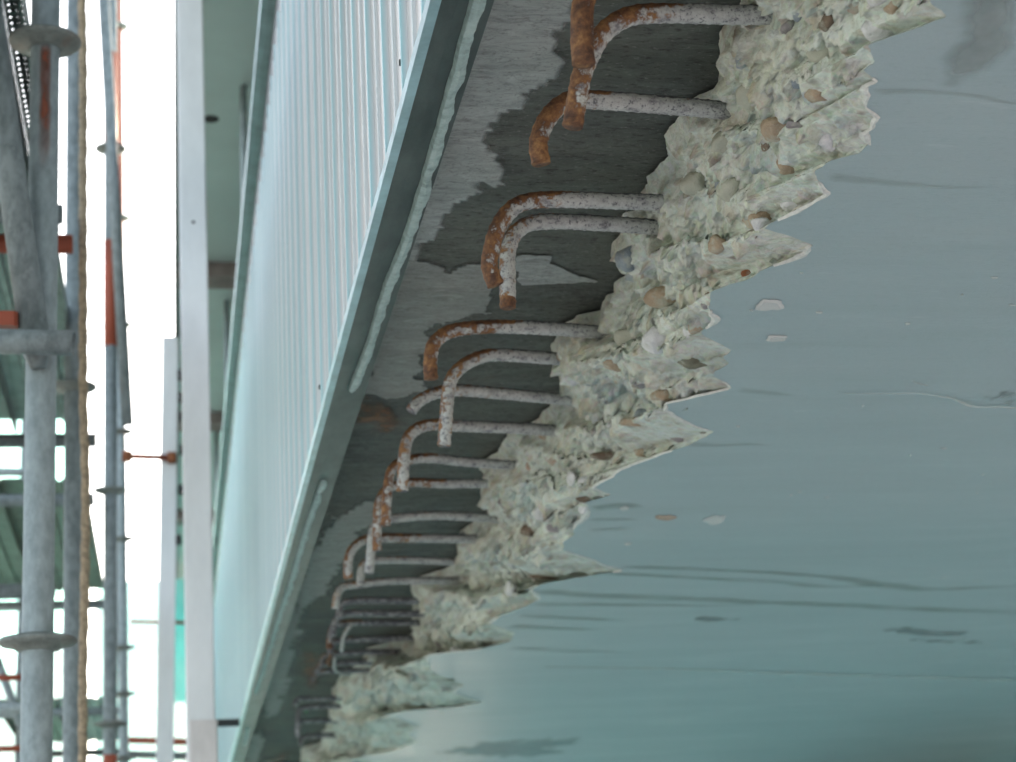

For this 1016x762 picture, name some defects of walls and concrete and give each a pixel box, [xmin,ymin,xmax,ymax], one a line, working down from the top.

peeling [244,501,374,762]
spalling [300,0,946,762]